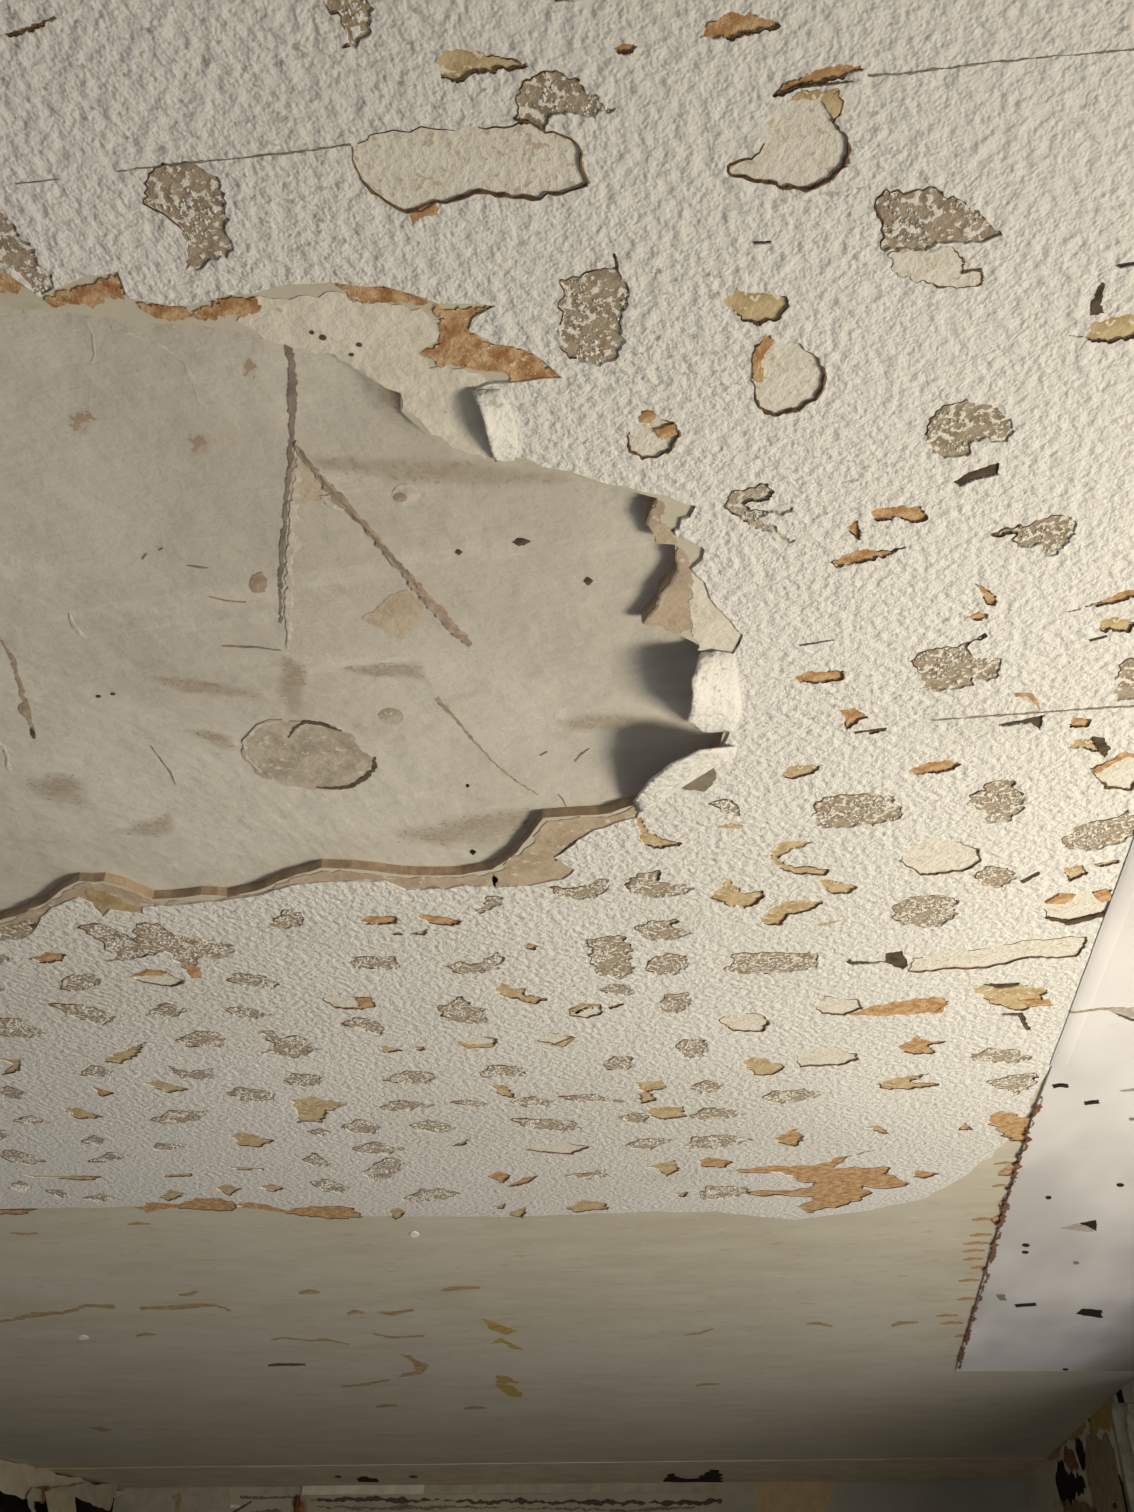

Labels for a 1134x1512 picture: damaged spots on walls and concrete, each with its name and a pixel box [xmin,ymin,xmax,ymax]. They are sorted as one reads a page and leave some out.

crack [798,48,1134,88]
crack [15,178,60,186]
crack [117,143,352,172]
peeling [237,291,494,458]
peeling [627,410,681,460]
crack [278,345,472,649]
spalling [241,719,378,790]
peeling [710,840,858,926]
peeling [908,860,1119,1011]
peeling [816,996,950,1016]
peeling [127,1166,363,1225]
peeling [700,1150,939,1214]